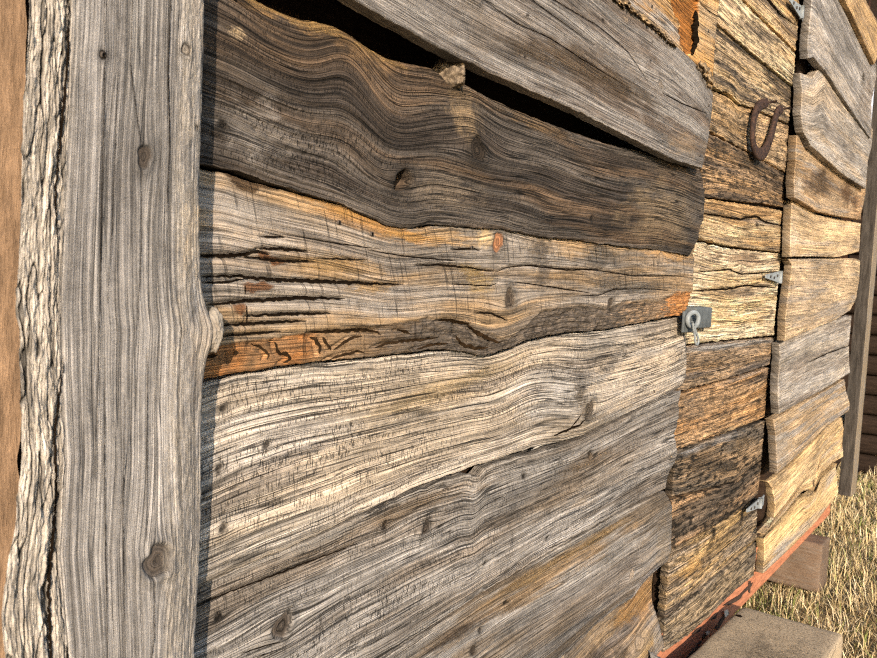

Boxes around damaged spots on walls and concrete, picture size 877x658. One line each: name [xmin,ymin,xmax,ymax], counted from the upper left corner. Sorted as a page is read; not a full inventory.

crack [200,234,673,337]
crack [694,269,777,291]
crack [554,415,586,436]